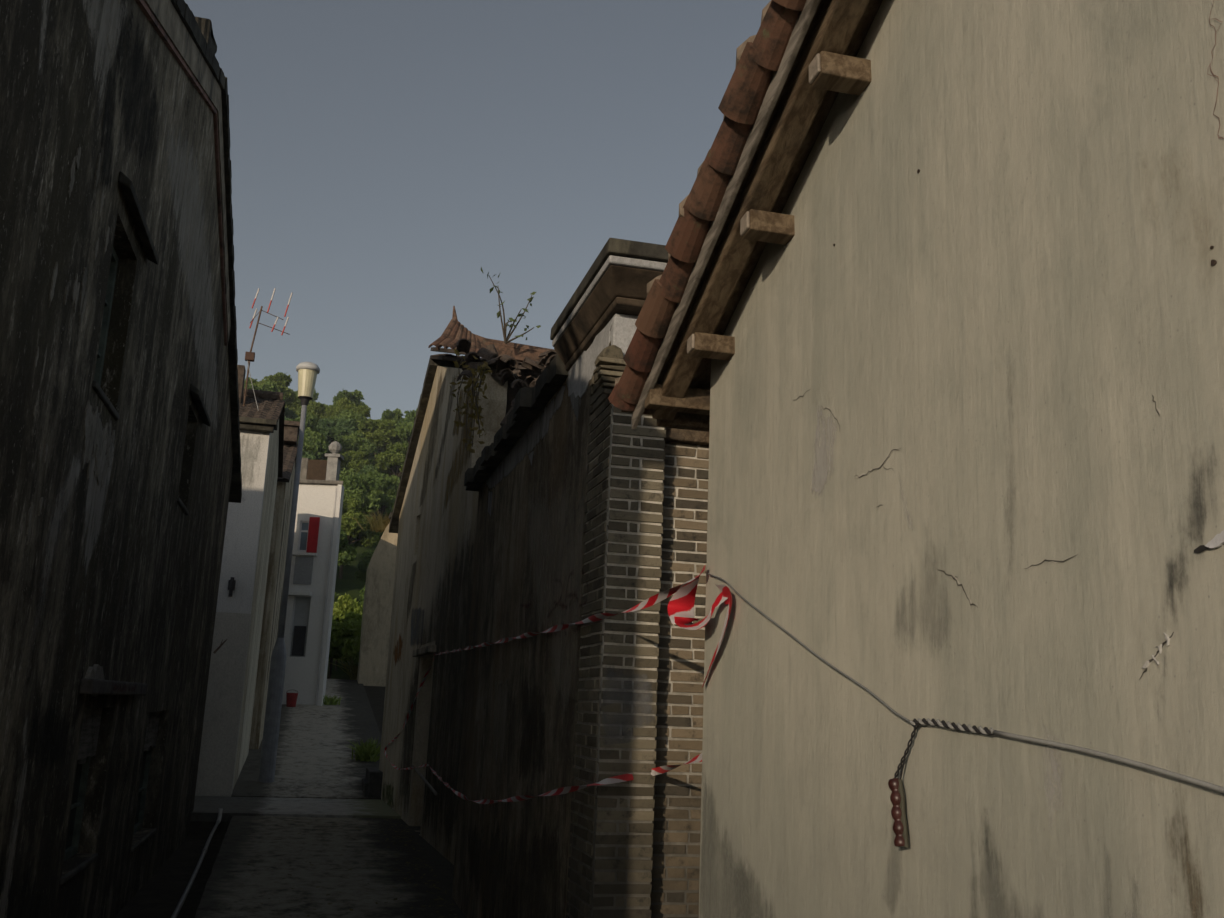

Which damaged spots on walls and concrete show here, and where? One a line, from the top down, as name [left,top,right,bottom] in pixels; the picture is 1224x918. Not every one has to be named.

crack [1207,0,1224,139]
damp [100,10,158,187]
crack [856,449,900,478]
damp [42,419,114,608]
crack [1025,554,1078,569]
peeling [1194,530,1224,552]
crack [939,570,976,606]
crack [1139,631,1176,680]